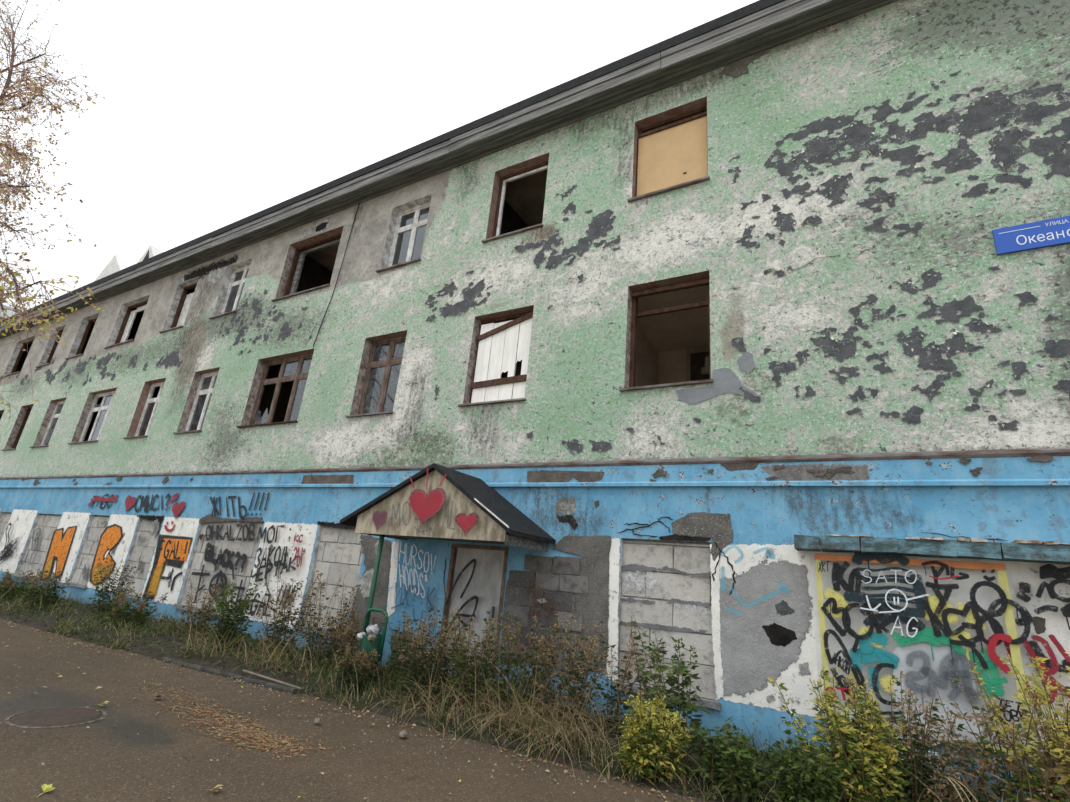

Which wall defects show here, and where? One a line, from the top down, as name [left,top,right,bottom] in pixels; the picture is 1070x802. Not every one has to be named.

peeling [735,70,1070,249]
peeling [514,185,620,270]
peeling [0,351,183,395]
peeling [219,290,312,355]
peeling [425,267,493,322]
peeling [676,268,1013,425]
peeling [962,360,1035,431]
peeling [1015,291,1038,311]
peeling [561,439,613,455]
crack [618,517,673,537]
flaking render [659,512,733,561]
flaking render [719,560,813,703]